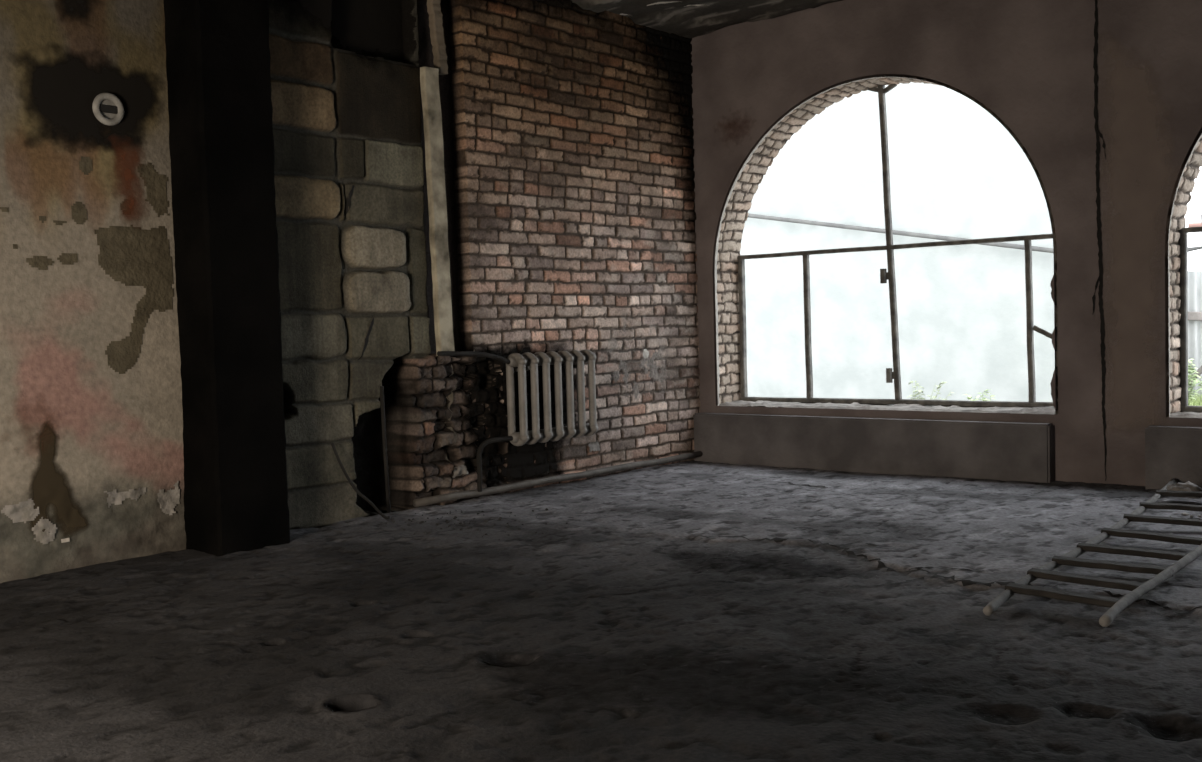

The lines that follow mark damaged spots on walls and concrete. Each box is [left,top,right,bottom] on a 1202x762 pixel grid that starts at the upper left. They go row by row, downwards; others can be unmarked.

flaking render [39,162,174,374]
flaking render [1,499,70,544]